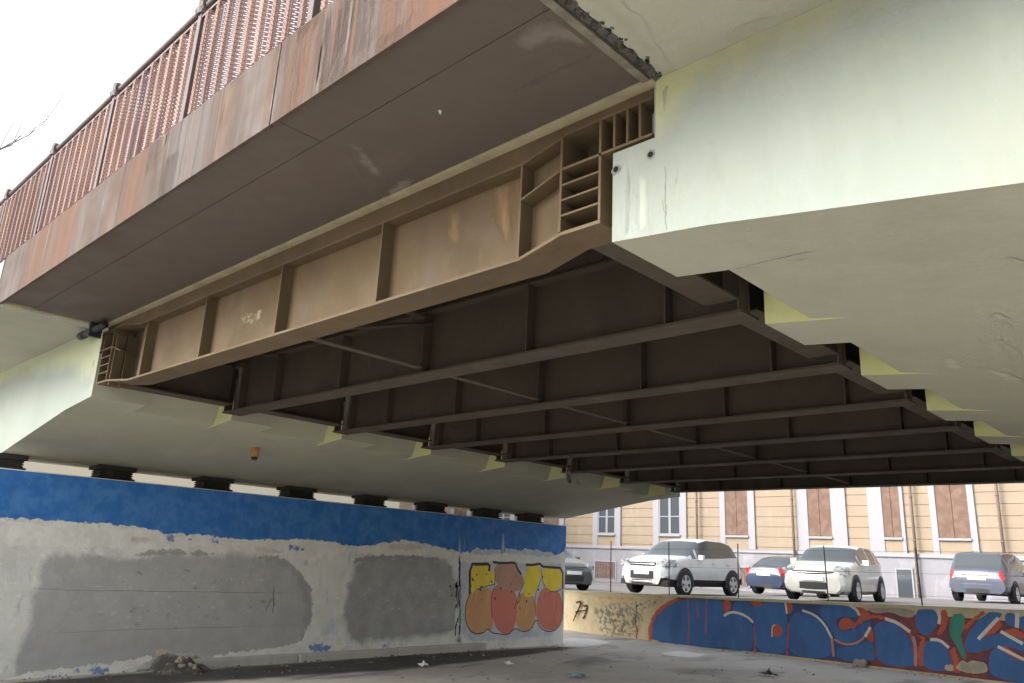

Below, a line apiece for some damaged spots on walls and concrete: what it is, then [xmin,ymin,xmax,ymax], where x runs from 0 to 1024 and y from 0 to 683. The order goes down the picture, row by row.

corrosion [274,9,325,119]
spalling [557,0,662,81]
corrosion [114,132,168,227]
corrosion [17,196,86,291]